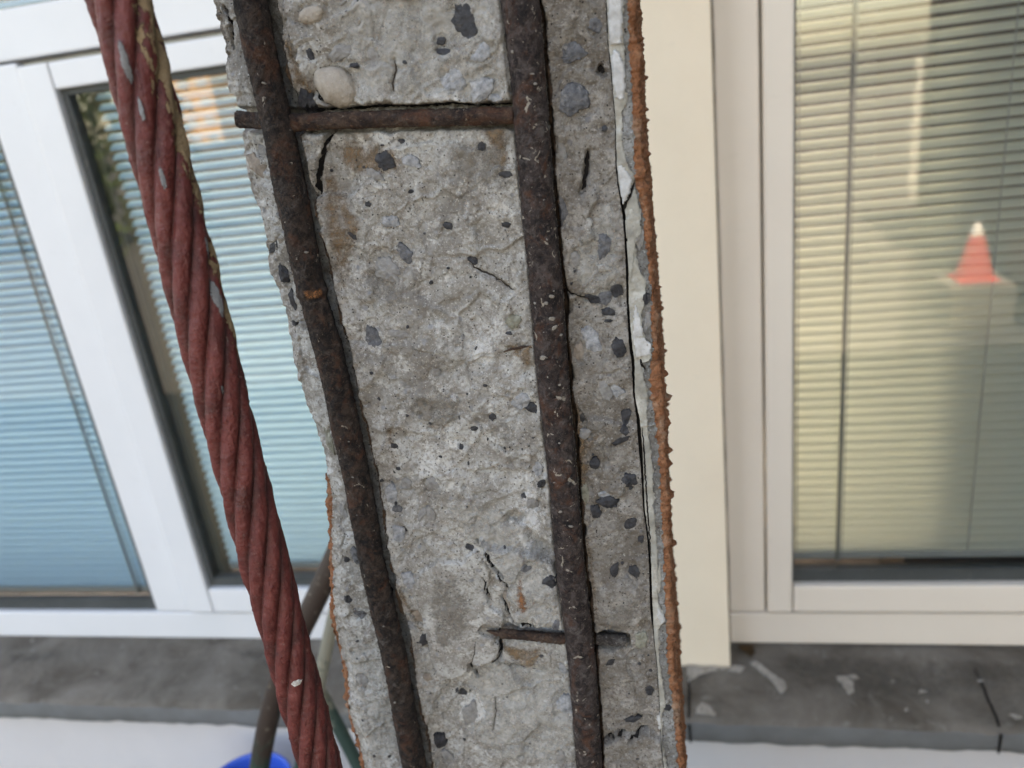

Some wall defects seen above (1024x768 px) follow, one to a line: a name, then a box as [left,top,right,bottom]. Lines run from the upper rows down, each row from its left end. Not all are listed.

spalling [326,0,495,97]
flaking render [608,0,626,100]
crack [315,60,512,194]
corrosion [304,178,358,342]
flaking render [618,166,642,281]
corrosion [539,0,605,768]
crack [598,0,661,741]
flaking render [633,305,651,358]
corrosion [352,364,434,768]
crack [470,552,535,673]
spalling [451,504,556,628]
corrosion [504,645,546,666]